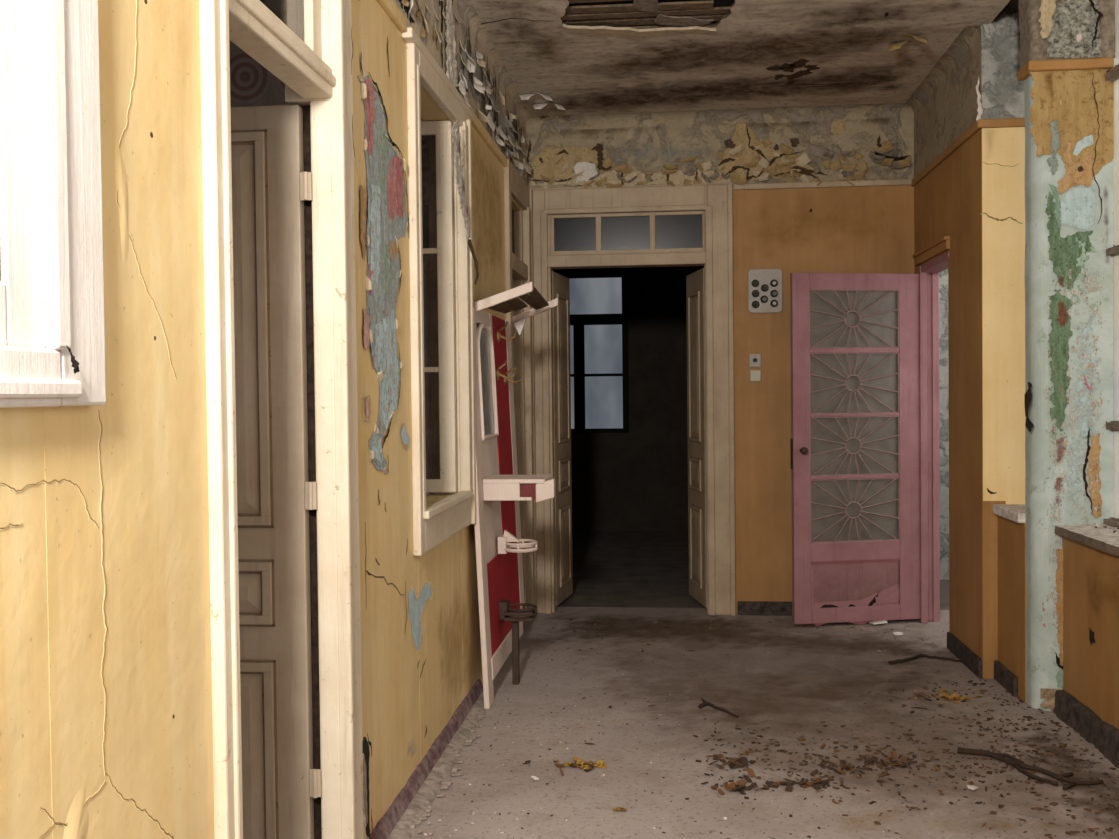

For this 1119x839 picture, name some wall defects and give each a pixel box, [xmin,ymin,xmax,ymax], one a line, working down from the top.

crack [119,0,138,148]
crack [441,0,533,88]
peeling [397,0,912,193]
water stain [565,70,896,109]
water stain [619,7,905,73]
spalling [1039,0,1103,59]
peeling [1042,74,1102,230]
crack [128,235,177,379]
peeling [351,29,410,474]
peeling [1024,382,1034,432]
crack [0,410,174,839]
peeling [365,526,433,678]